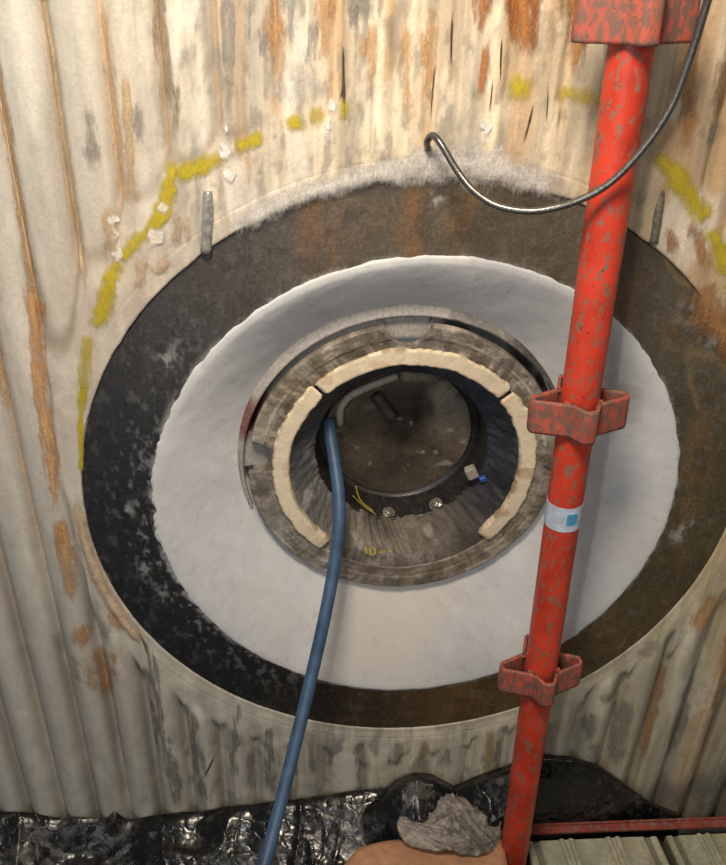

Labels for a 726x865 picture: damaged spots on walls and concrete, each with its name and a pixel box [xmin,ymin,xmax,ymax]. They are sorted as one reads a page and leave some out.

rust [472,0,490,28]
rust [506,0,539,47]
rust [479,49,489,92]
rust [689,227,706,264]
rust [691,285,726,352]
rust [54,522,76,594]
damp [145,645,181,801]
rust [702,652,726,751]